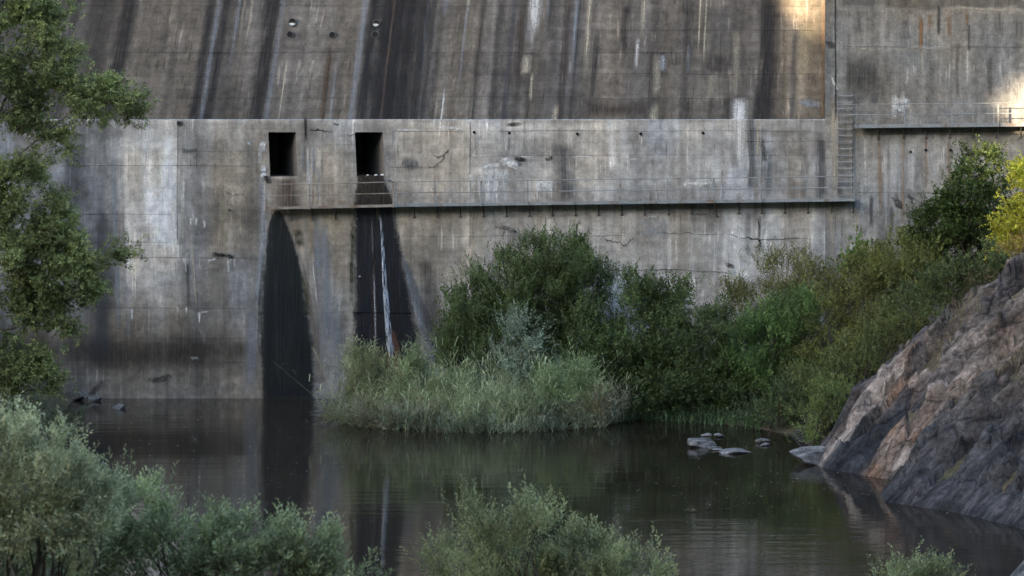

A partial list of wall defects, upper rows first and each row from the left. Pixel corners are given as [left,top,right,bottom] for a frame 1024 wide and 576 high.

water stain [177,0,230,126]
water stain [250,0,279,119]
water stain [250,176,330,399]
water stain [350,175,440,399]
crack [658,213,807,252]